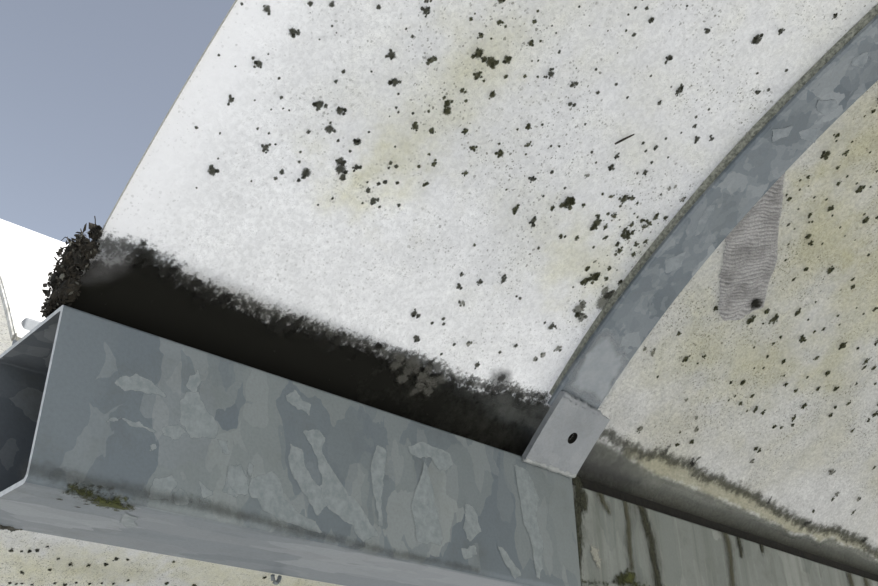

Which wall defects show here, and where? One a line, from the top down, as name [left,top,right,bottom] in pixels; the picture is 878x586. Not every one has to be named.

leakage [471,32,512,82]
leakage [312,101,347,142]
leakage [335,131,370,181]
leakage [836,141,872,193]
leakage [361,180,399,208]
leakage [550,187,585,211]
leakage [572,193,668,309]
leakage [570,300,587,322]
leakage [746,299,779,324]
leakage [570,335,624,403]
leakage [577,416,878,586]